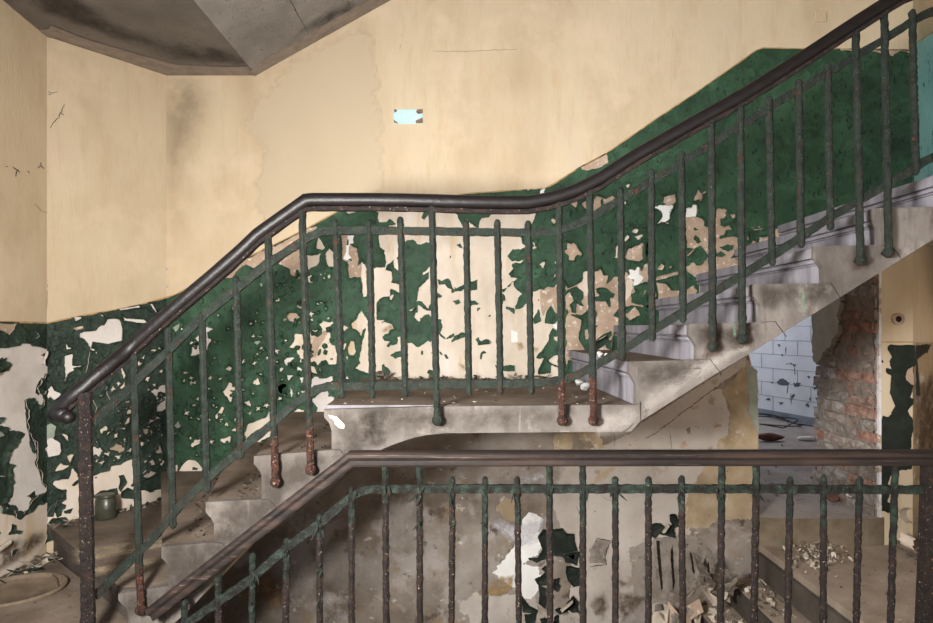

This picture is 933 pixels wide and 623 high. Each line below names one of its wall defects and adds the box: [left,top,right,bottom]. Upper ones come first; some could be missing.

water stain [1,535,40,567]
peeling [0,302,159,577]
peeling [93,181,768,510]
peeling [460,466,753,623]
flaking render [553,275,931,450]
flaking render [812,466,912,517]